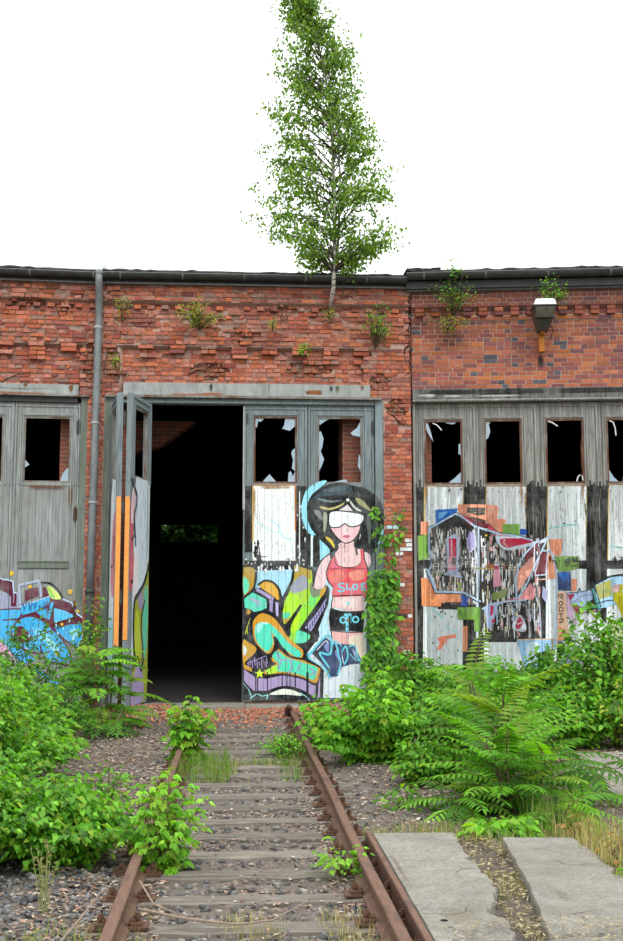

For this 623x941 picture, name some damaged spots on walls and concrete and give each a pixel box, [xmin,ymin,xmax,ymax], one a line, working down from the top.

peeling [253,526,306,573]